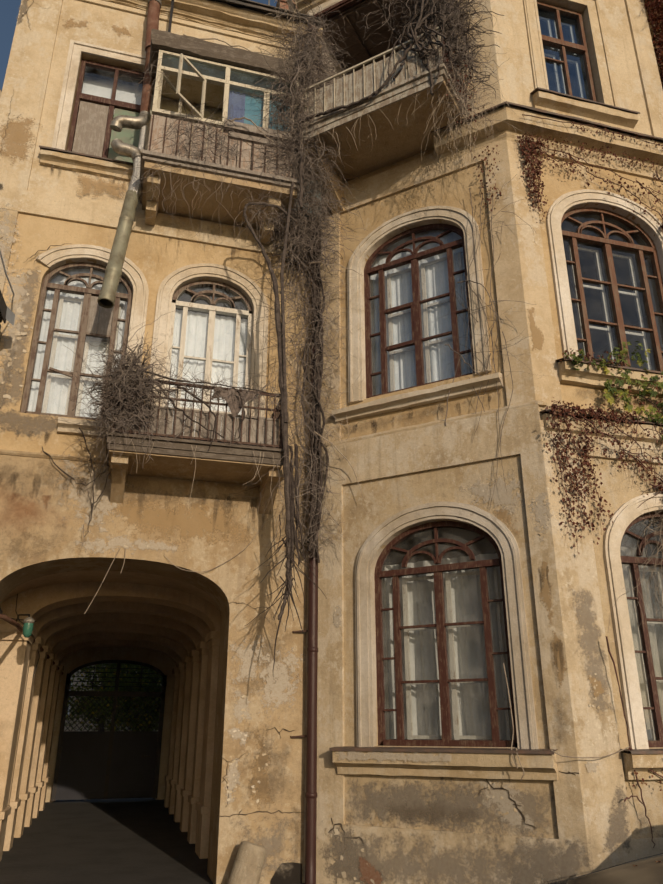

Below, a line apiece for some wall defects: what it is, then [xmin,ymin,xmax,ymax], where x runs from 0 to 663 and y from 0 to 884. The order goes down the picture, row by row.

peeling [0,118,35,161]
leakage [111,497,251,545]
peeling [224,635,306,809]
crack [478,779,537,829]
flaking render [475,778,543,838]